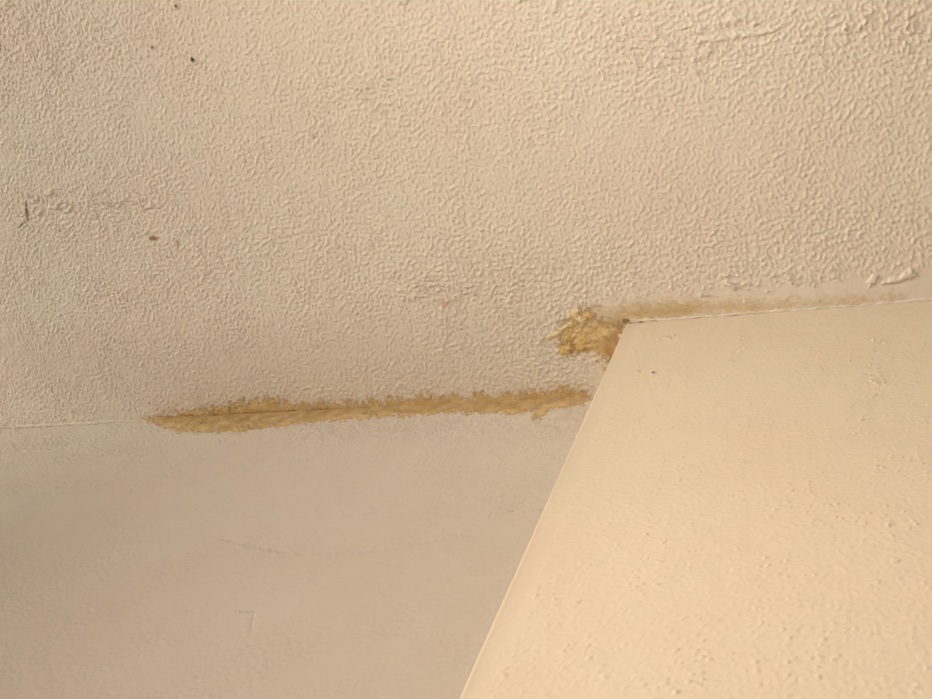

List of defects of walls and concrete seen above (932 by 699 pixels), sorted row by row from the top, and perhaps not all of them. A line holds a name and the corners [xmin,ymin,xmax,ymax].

damp [536,302,702,370]
damp [147,385,593,434]